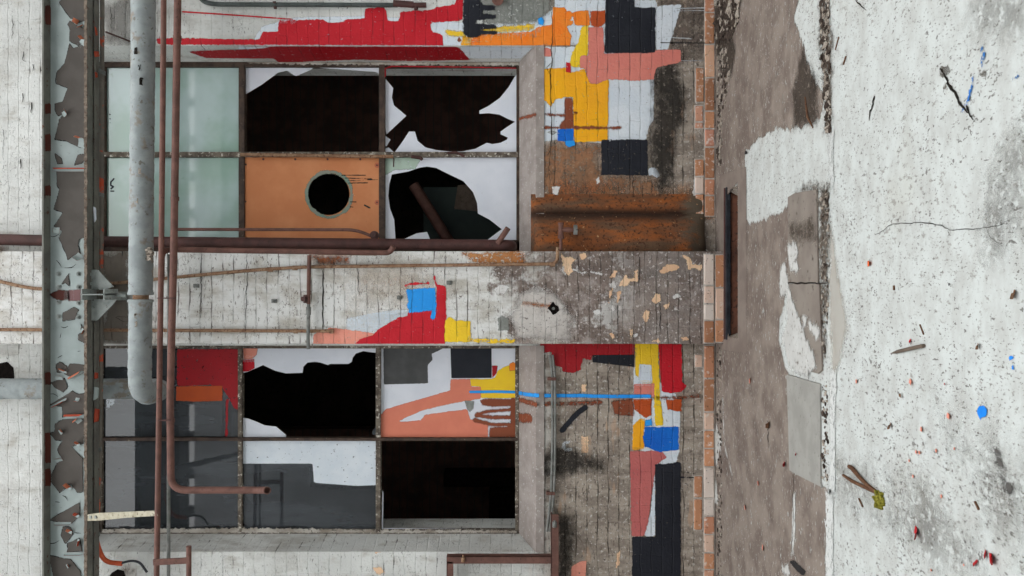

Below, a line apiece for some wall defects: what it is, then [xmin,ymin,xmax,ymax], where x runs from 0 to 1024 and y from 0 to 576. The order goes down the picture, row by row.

crack [940,68,973,120]
peeling [45,0,99,261]
crack [875,222,1002,243]
peeling [62,307,84,343]
peeling [561,253,638,315]
peeling [642,294,681,323]
peeling [660,0,828,576]